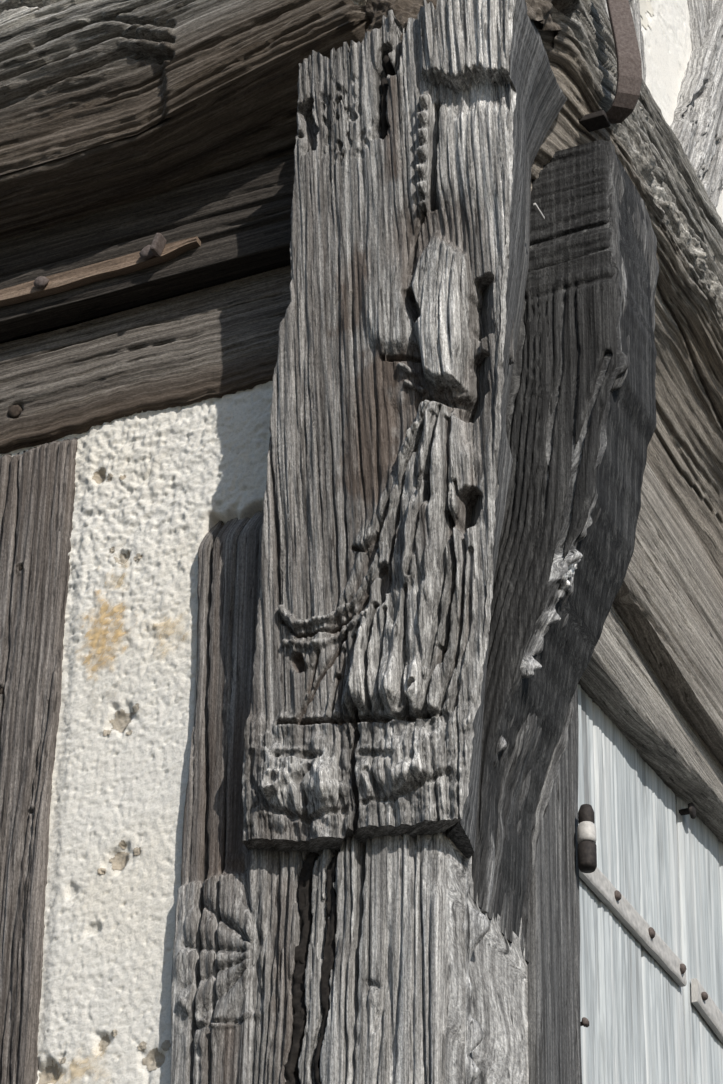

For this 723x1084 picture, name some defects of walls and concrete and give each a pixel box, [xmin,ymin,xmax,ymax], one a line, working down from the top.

damp [84,590,126,671]
flaking render [97,840,141,875]
crack [284,712,361,1084]
flaking render [38,1056,66,1084]
flaking render [137,1040,171,1071]